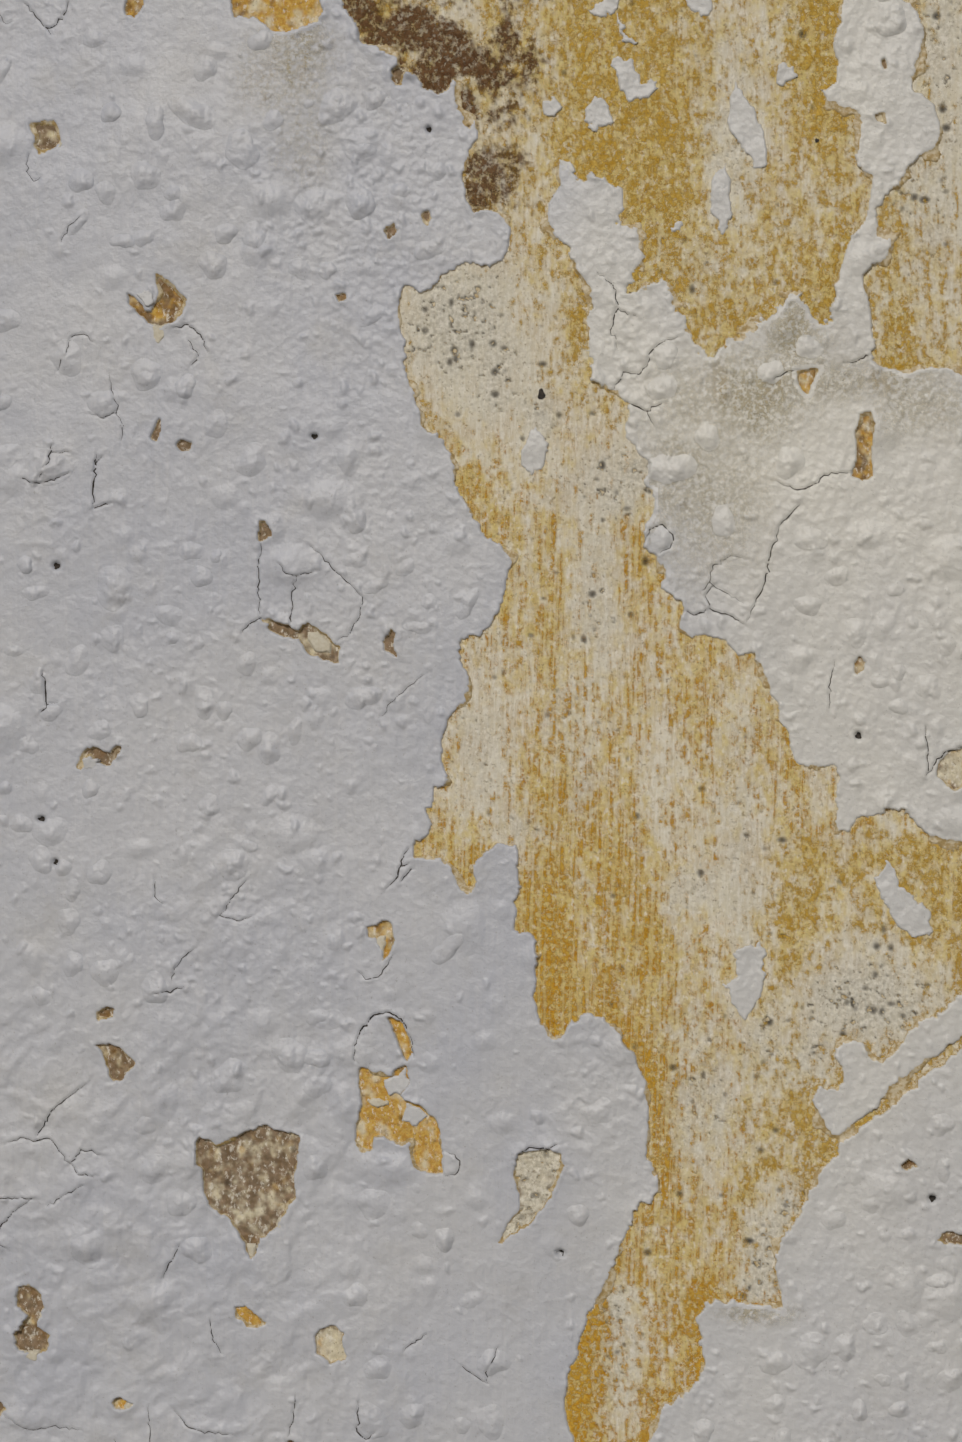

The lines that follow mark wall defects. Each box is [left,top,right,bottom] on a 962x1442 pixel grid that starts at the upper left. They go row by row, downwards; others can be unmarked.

peeling [36,125,62,153]
peeling [130,278,183,343]
crack [687,472,850,624]
crack [243,547,363,638]
peeling [270,622,339,663]
peeling [82,746,121,769]
peeling [343,0,962,1442]
peeling [98,1044,135,1080]
crack [0,1087,96,1247]
spalling [197,1125,300,1257]
peeling [16,1286,48,1361]